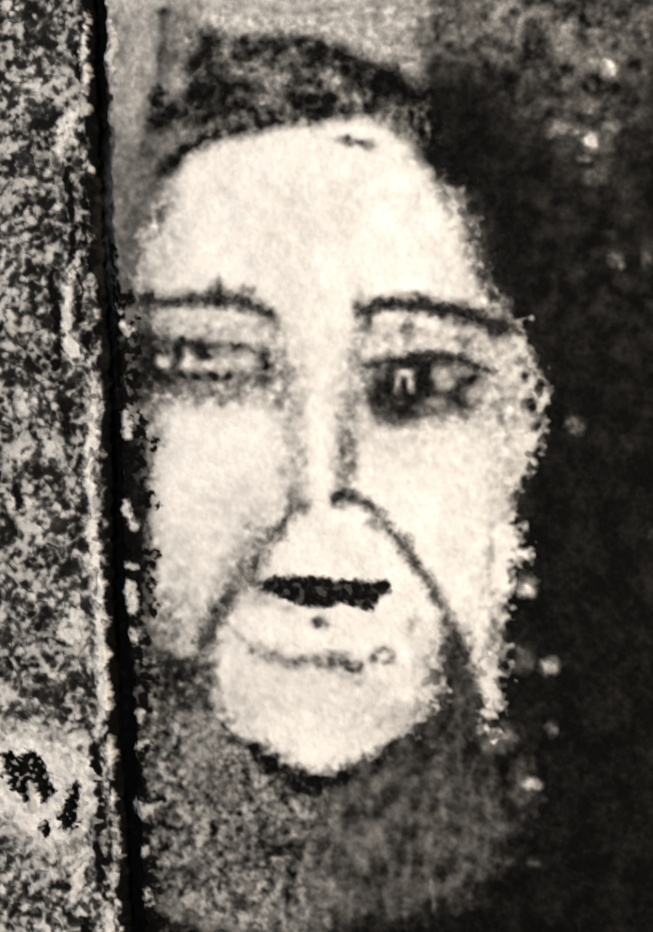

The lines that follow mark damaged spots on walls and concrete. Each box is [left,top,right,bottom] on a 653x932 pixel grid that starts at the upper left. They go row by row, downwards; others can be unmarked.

spalling [78,13,91,93]
spalling [52,107,80,155]
spalling [61,252,83,360]
crack [47,0,169,932]
spalling [0,372,117,908]
spalling [109,827,119,889]
spalling [97,894,115,932]